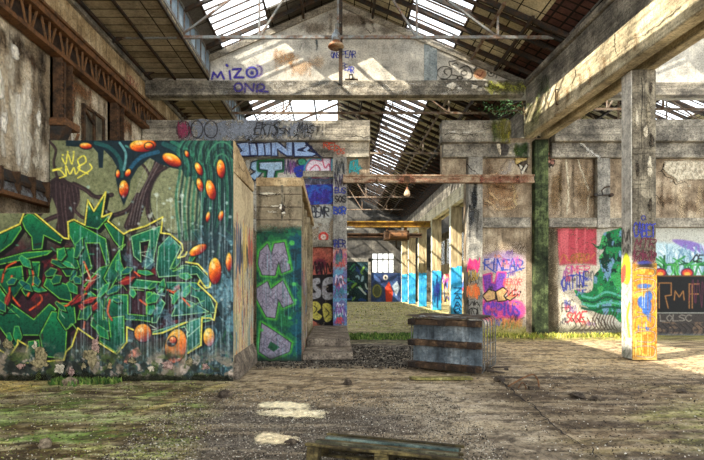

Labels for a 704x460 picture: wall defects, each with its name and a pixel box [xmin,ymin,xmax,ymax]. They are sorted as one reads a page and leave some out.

water stain [0,29,47,170]